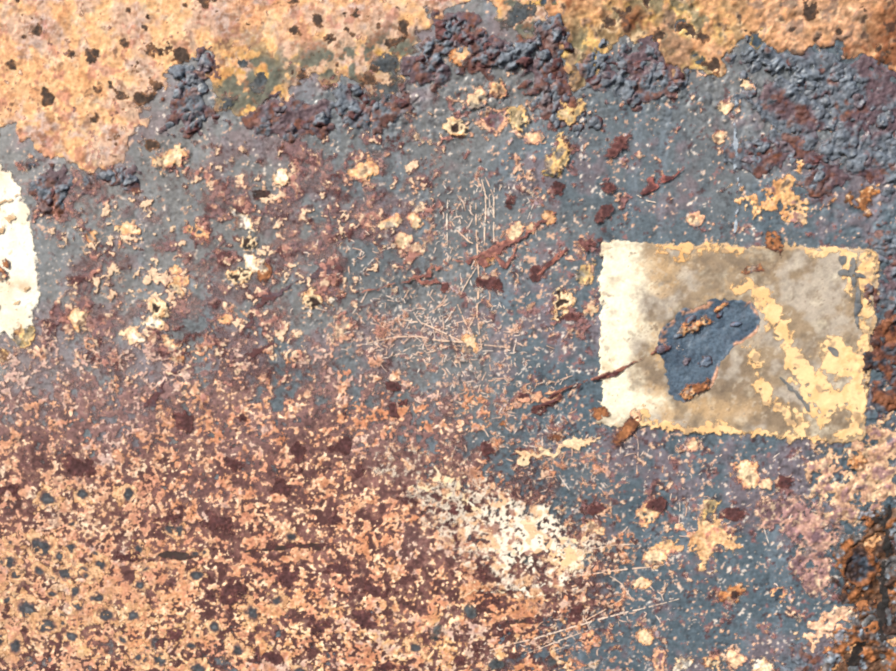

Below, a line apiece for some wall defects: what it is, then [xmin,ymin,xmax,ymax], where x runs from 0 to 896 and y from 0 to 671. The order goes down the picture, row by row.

corrosion [490,0,896,127]
corrosion [0,0,659,671]
peeling [655,298,760,403]
corrosion [630,314,896,671]